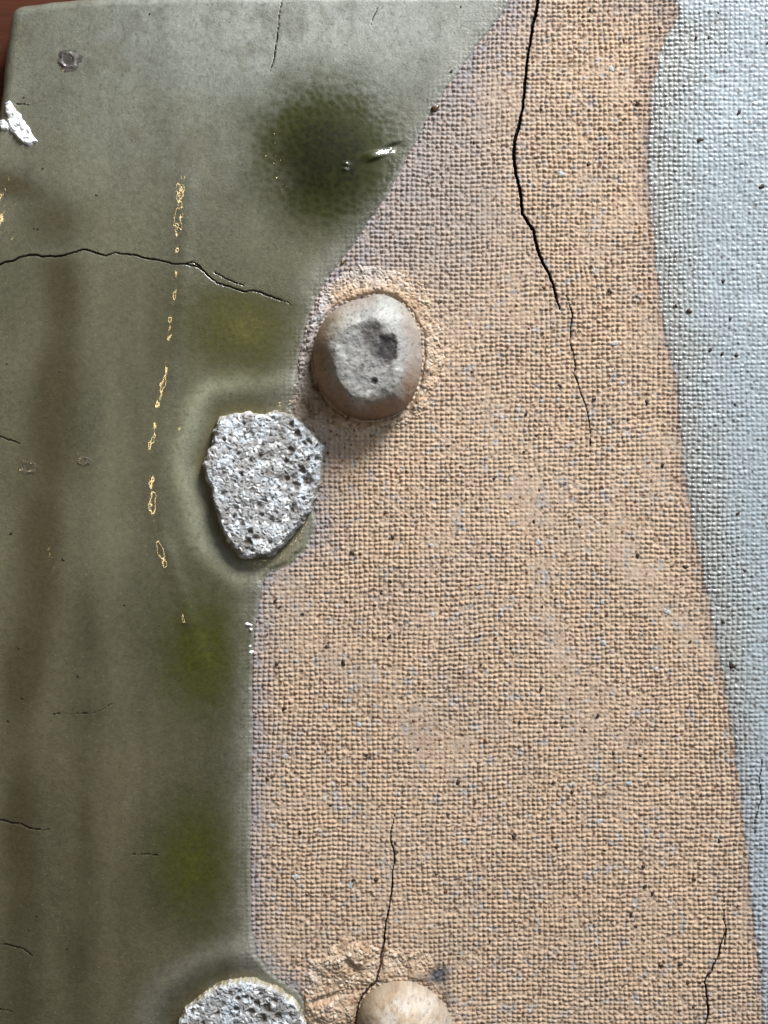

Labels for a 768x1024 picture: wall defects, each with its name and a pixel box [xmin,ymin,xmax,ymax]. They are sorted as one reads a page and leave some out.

crack [0,249,291,305]
leakage [260,88,394,226]
crack [512,0,591,452]
crack [355,814,395,1024]
crack [704,883,727,1024]